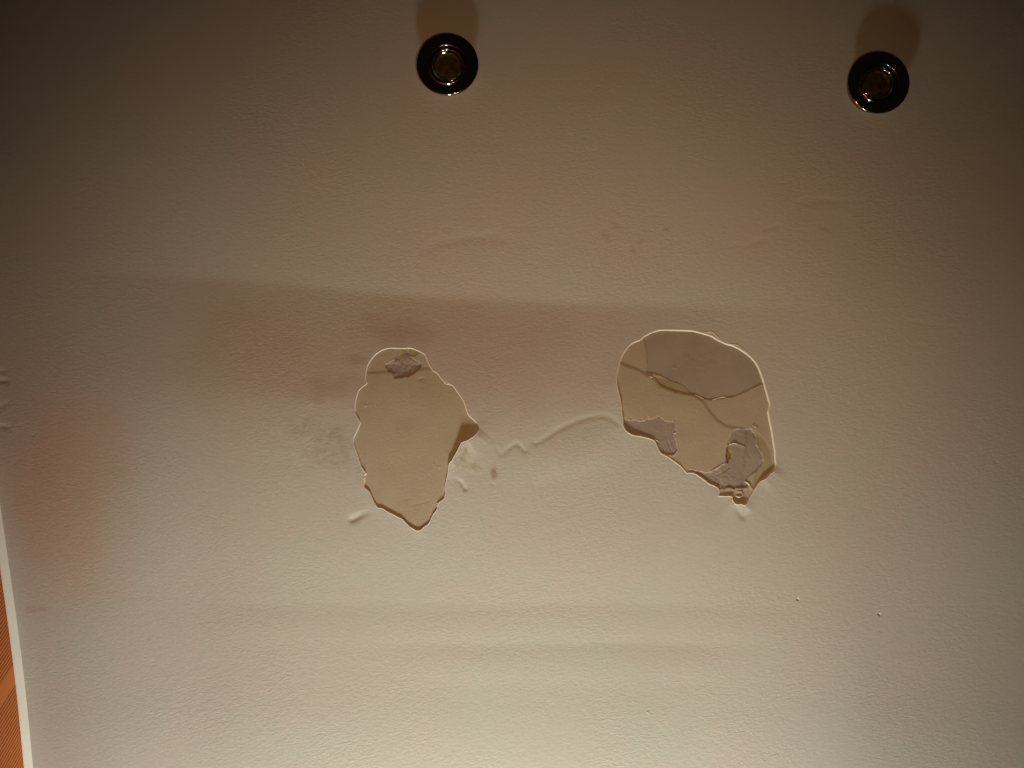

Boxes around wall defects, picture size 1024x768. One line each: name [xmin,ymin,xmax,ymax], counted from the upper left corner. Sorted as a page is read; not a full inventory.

peeling [353,348,480,531]
peeling [616,329,777,506]